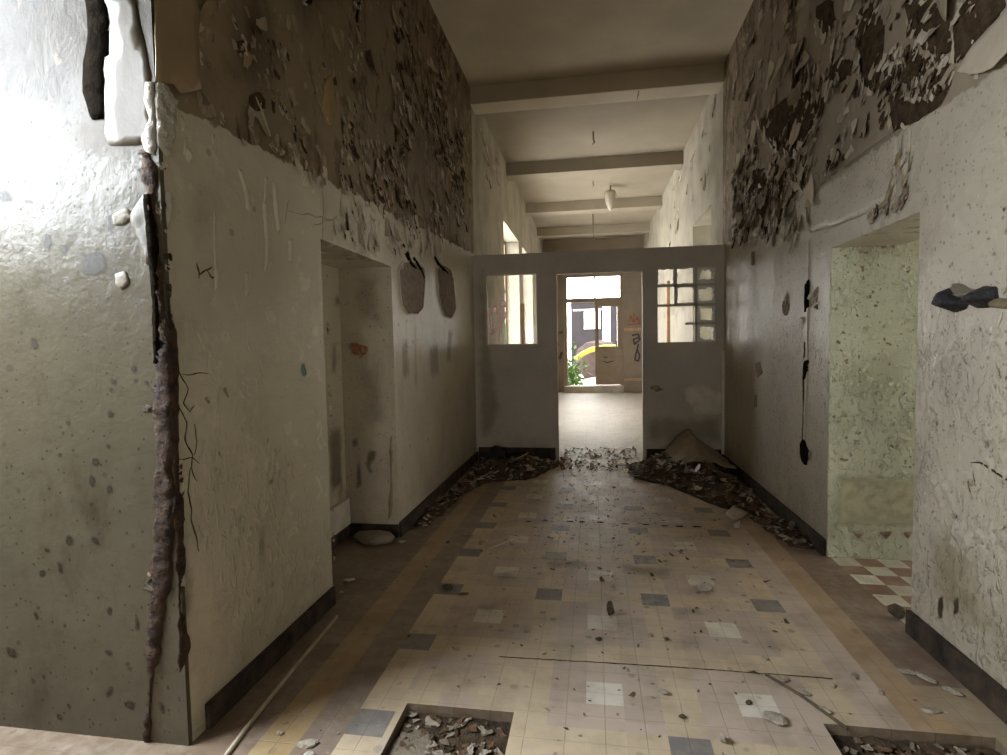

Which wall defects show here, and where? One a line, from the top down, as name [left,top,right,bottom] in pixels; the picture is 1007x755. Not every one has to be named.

peeling [728,0,1007,265]
crack [179,371,208,551]
flaking render [104,0,471,743]
flaking render [780,290,790,316]
crack [799,240,812,466]
flaking render [800,286,820,325]